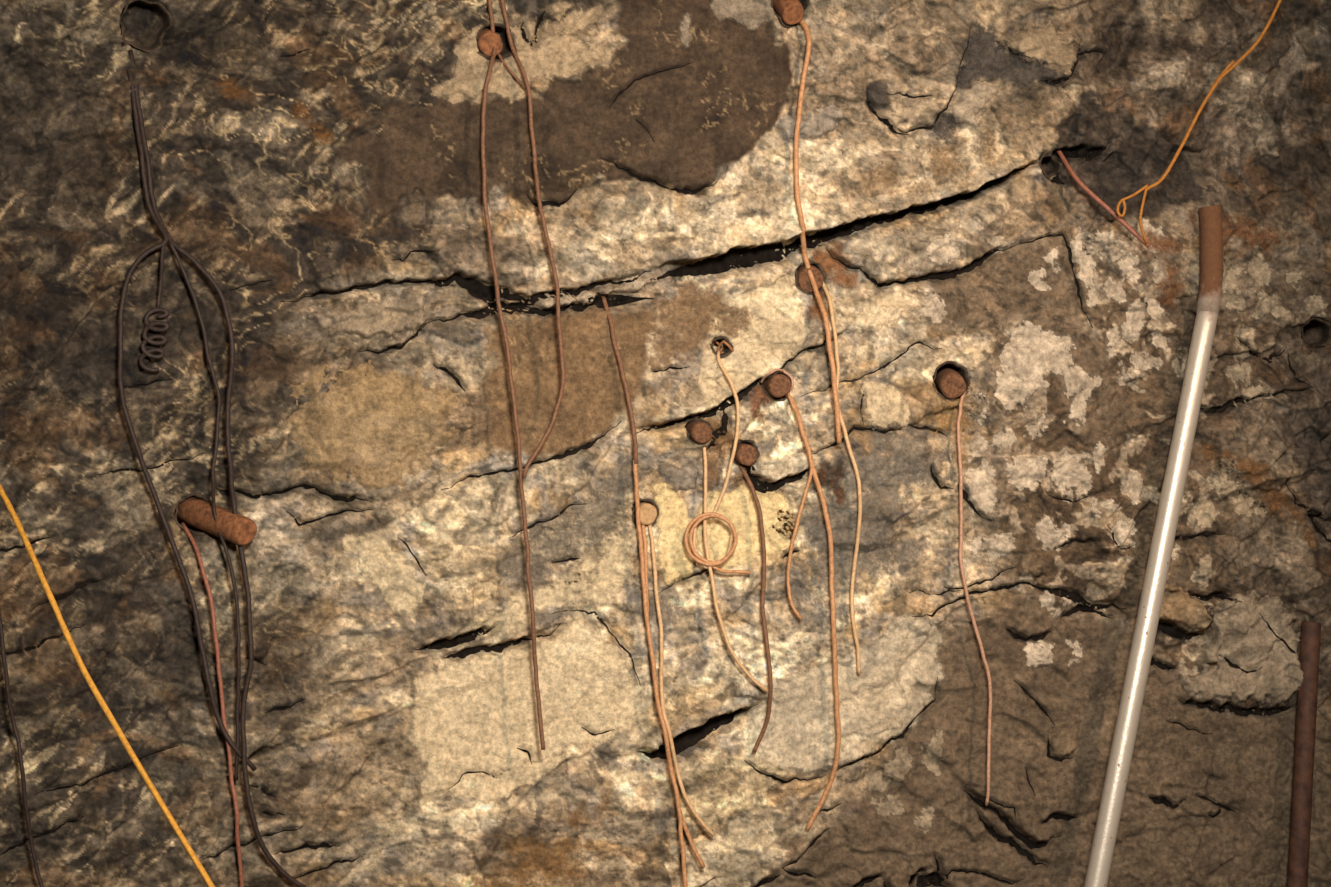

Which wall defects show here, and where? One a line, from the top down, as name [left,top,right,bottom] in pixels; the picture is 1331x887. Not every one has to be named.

crack [230,141,1110,391]
rust [808,240,857,318]
rust [751,383,775,421]
rust [707,419,744,486]
crack [658,569,708,594]
crack [908,567,1126,641]
crack [1188,592,1300,656]
crack [1150,621,1295,734]
crack [581,704,758,759]
crack [744,677,938,887]
crack [853,680,1079,887]
crack [1148,794,1239,818]